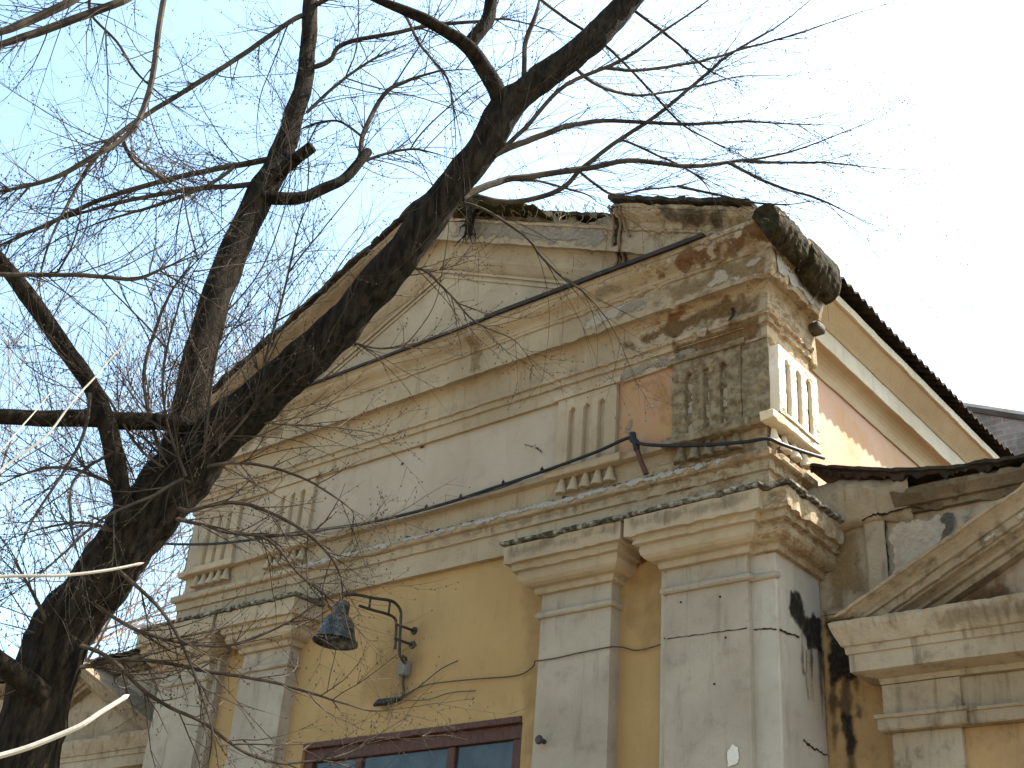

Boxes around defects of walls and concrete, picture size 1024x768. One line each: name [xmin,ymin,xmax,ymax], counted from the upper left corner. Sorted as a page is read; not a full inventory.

spalling [656,222,823,310]
crack [667,627,799,639]
damp [790,590,860,768]
crack [804,739,829,758]